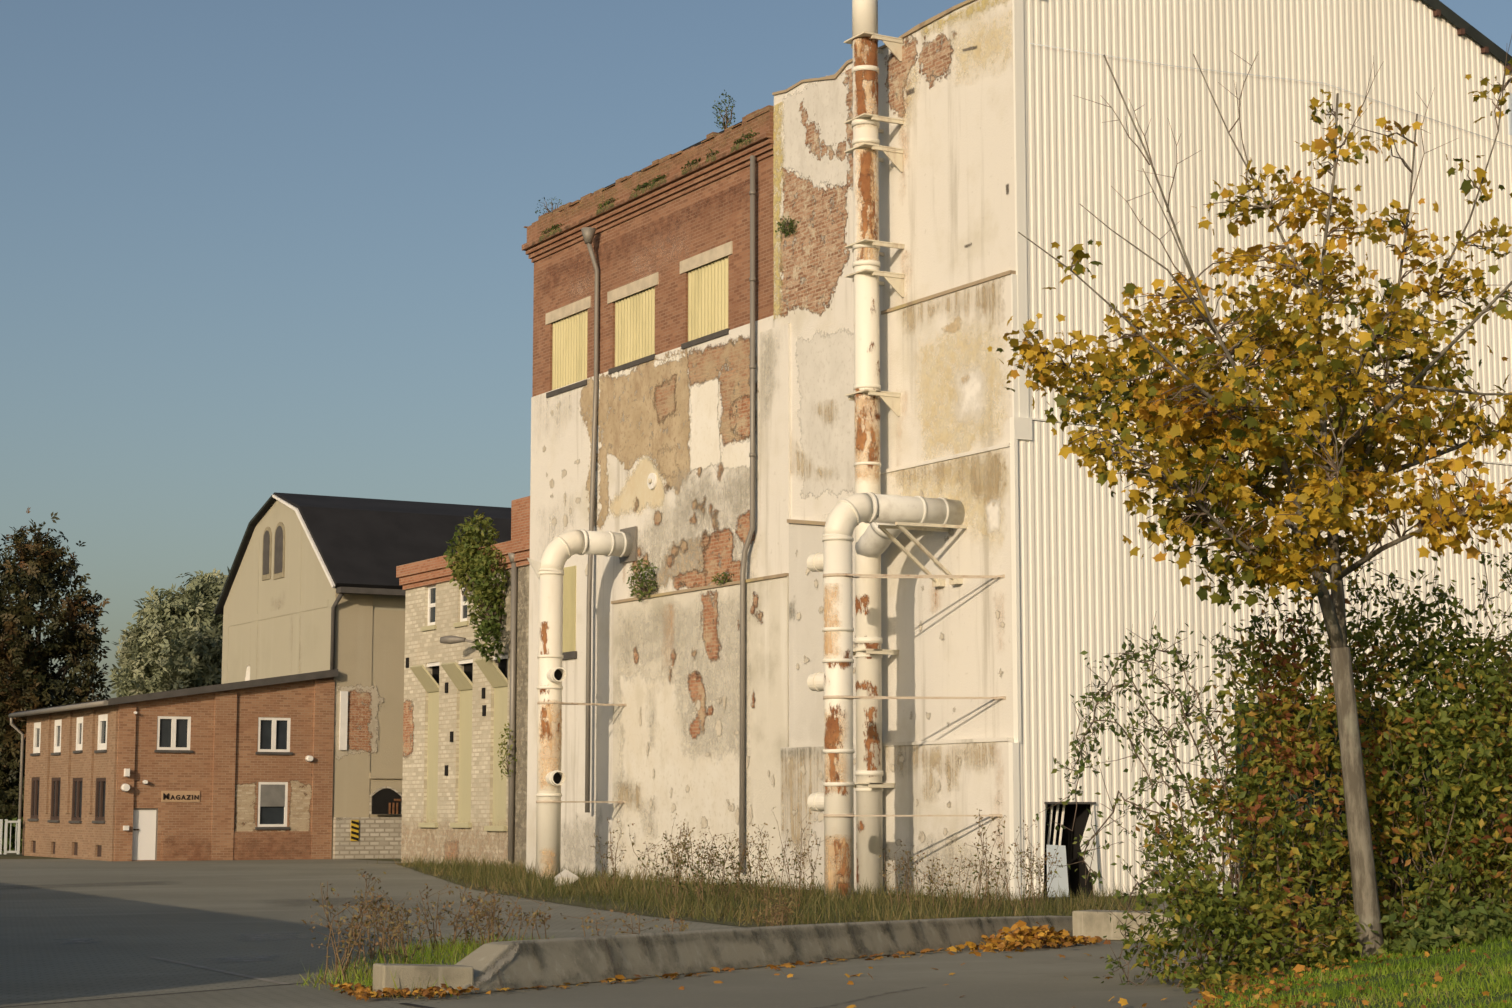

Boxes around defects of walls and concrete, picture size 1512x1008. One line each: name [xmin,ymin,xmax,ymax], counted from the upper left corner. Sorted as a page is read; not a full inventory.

rust [852,37,878,116]
flaking render [916,32,957,89]
flaking render [778,68,853,317]
rust [857,147,878,260]
rust [854,343,880,477]
flaking render [546,335,763,757]
rust [824,587,881,777]
rust [824,703,848,795]
flaking render [727,799,753,825]
rust [827,821,864,900]